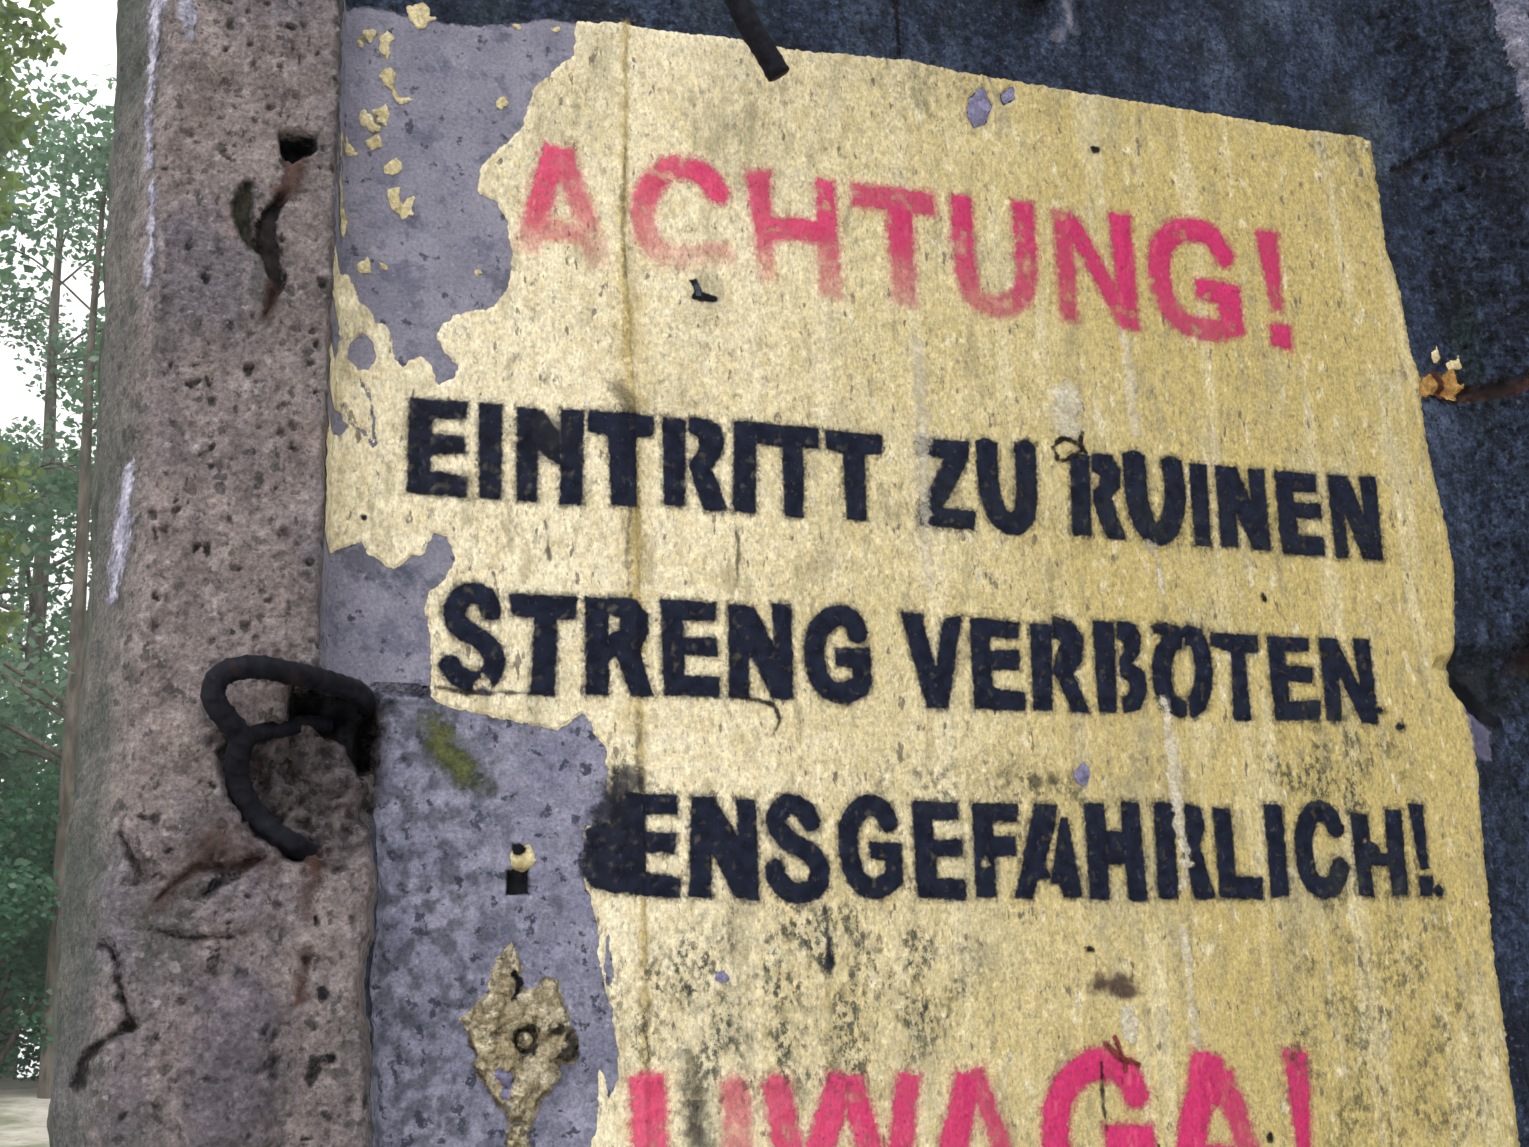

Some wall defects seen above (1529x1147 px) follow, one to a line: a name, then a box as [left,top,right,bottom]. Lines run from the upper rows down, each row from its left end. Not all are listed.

rust [281,158,306,204]
peeling [327,0,576,448]
rust [1419,346,1464,401]
peeling [247,507,619,1147]